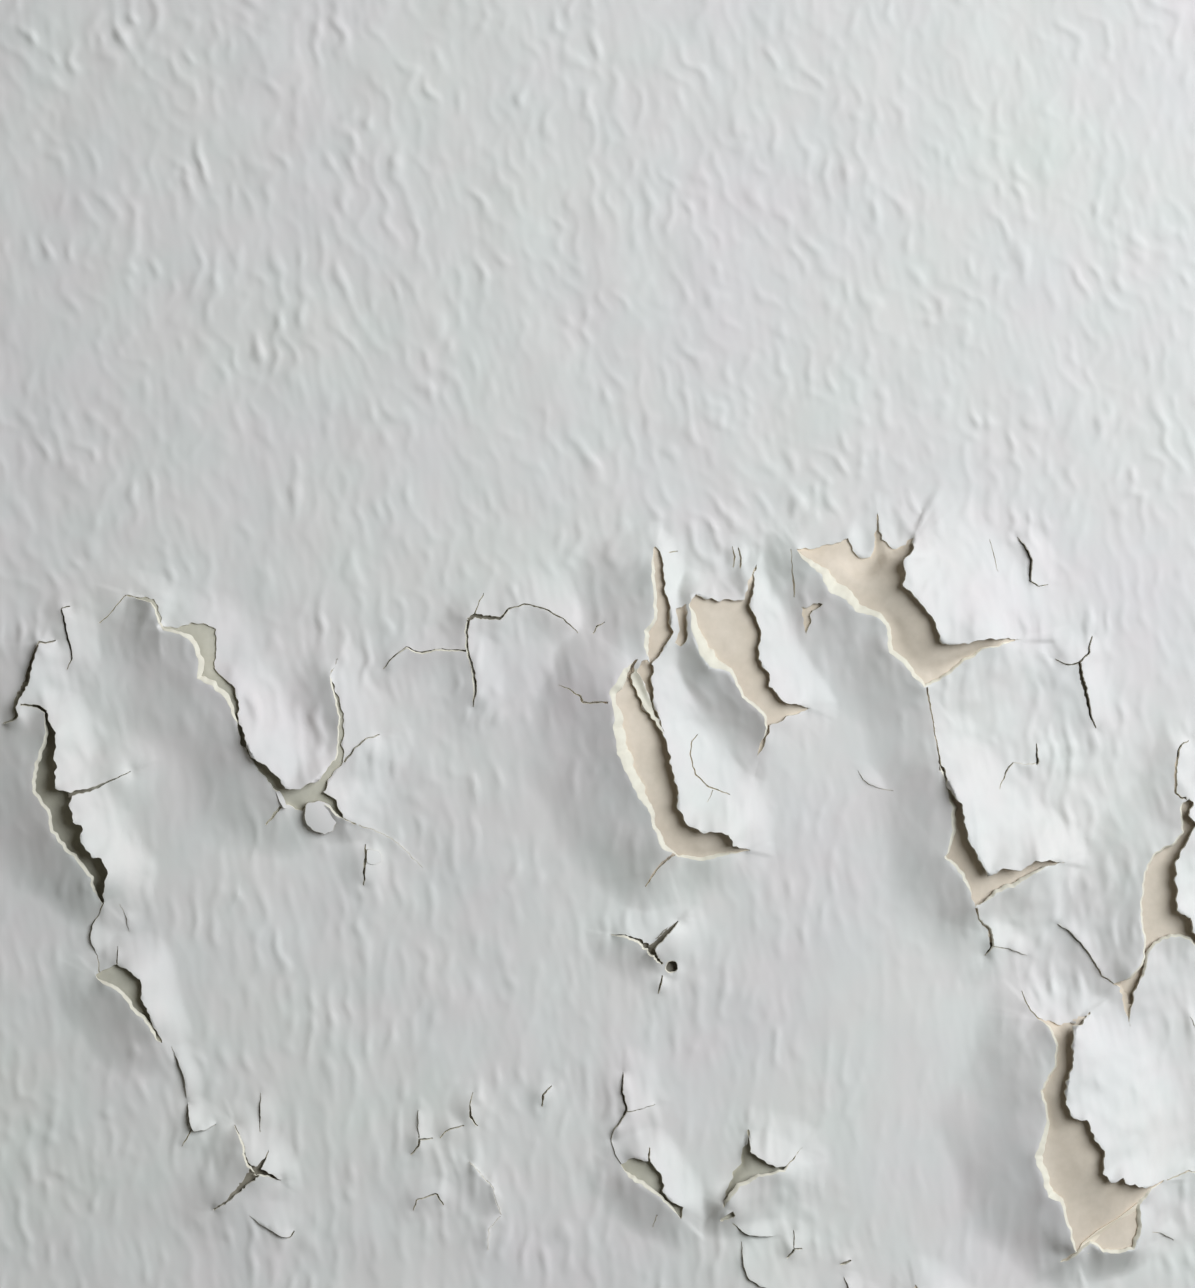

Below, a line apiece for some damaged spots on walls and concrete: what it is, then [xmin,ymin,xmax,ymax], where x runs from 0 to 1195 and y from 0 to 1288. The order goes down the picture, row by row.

peeling [0,582,431,1155]
crack [375,583,614,716]
crack [601,913,687,1002]
peeling [549,482,1195,1288]